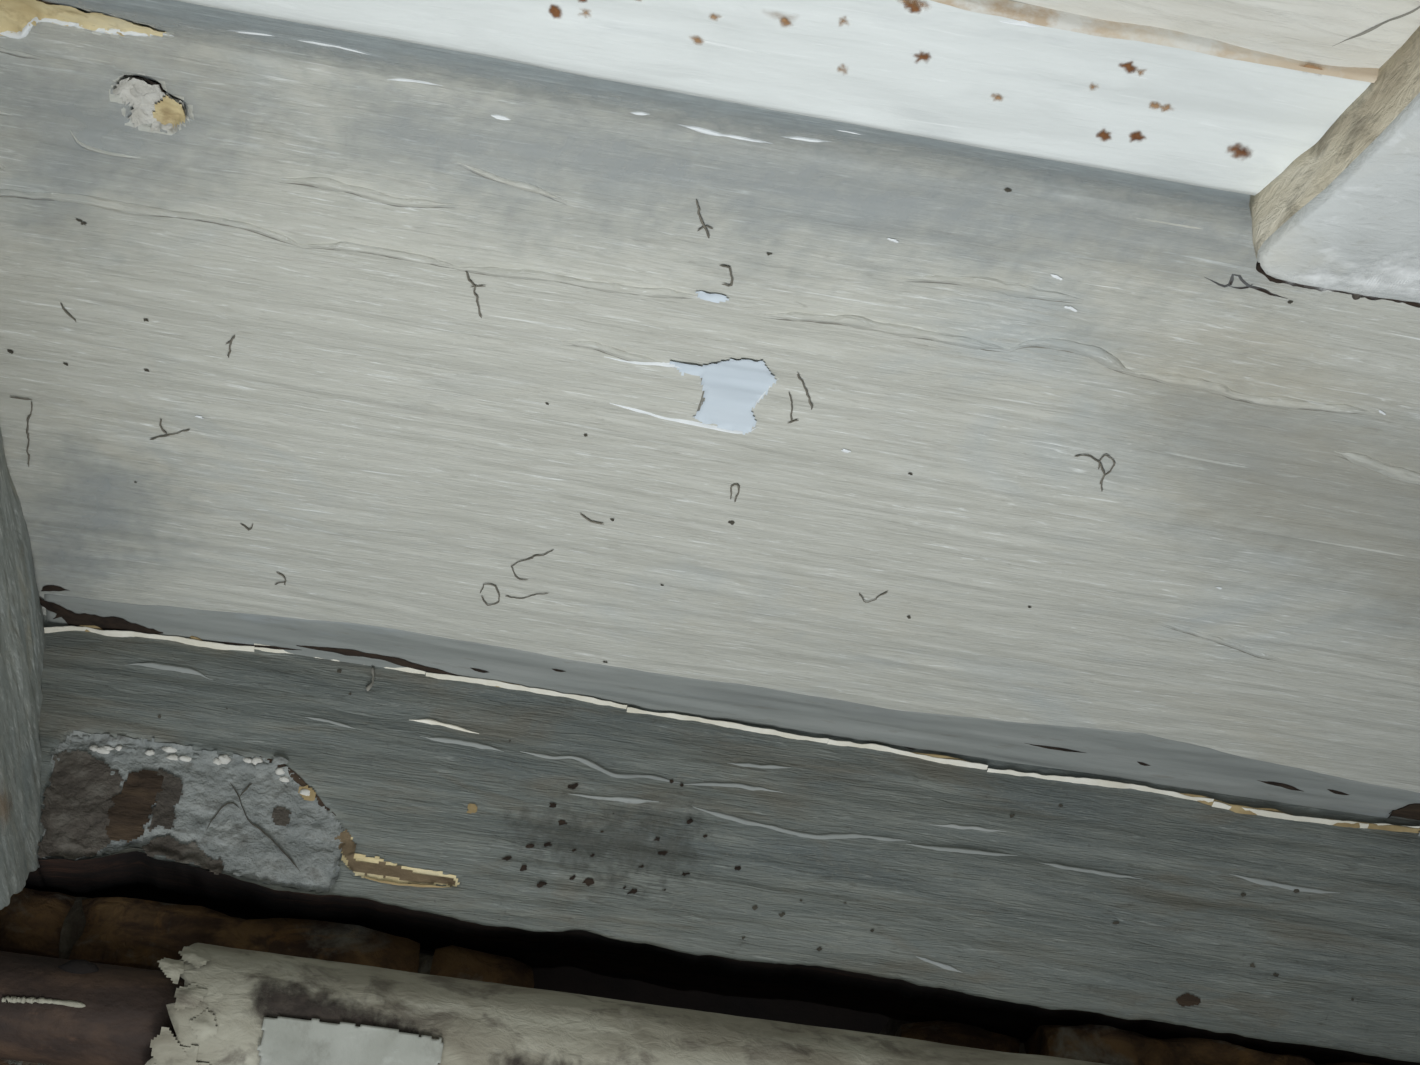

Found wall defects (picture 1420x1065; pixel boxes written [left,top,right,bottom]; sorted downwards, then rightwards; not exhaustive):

peeling [0,0,174,39]
corrosion [549,6,561,18]
corrosion [902,0,927,13]
crack [1205,274,1288,299]
crack [765,312,1375,416]
peeling [606,357,778,435]
crack [39,585,1420,879]
flaking render [37,730,460,893]
crack [1230,874,1340,893]
peeling [157,946,214,1011]
crack [916,956,963,973]
peeling [150,1027,210,1065]